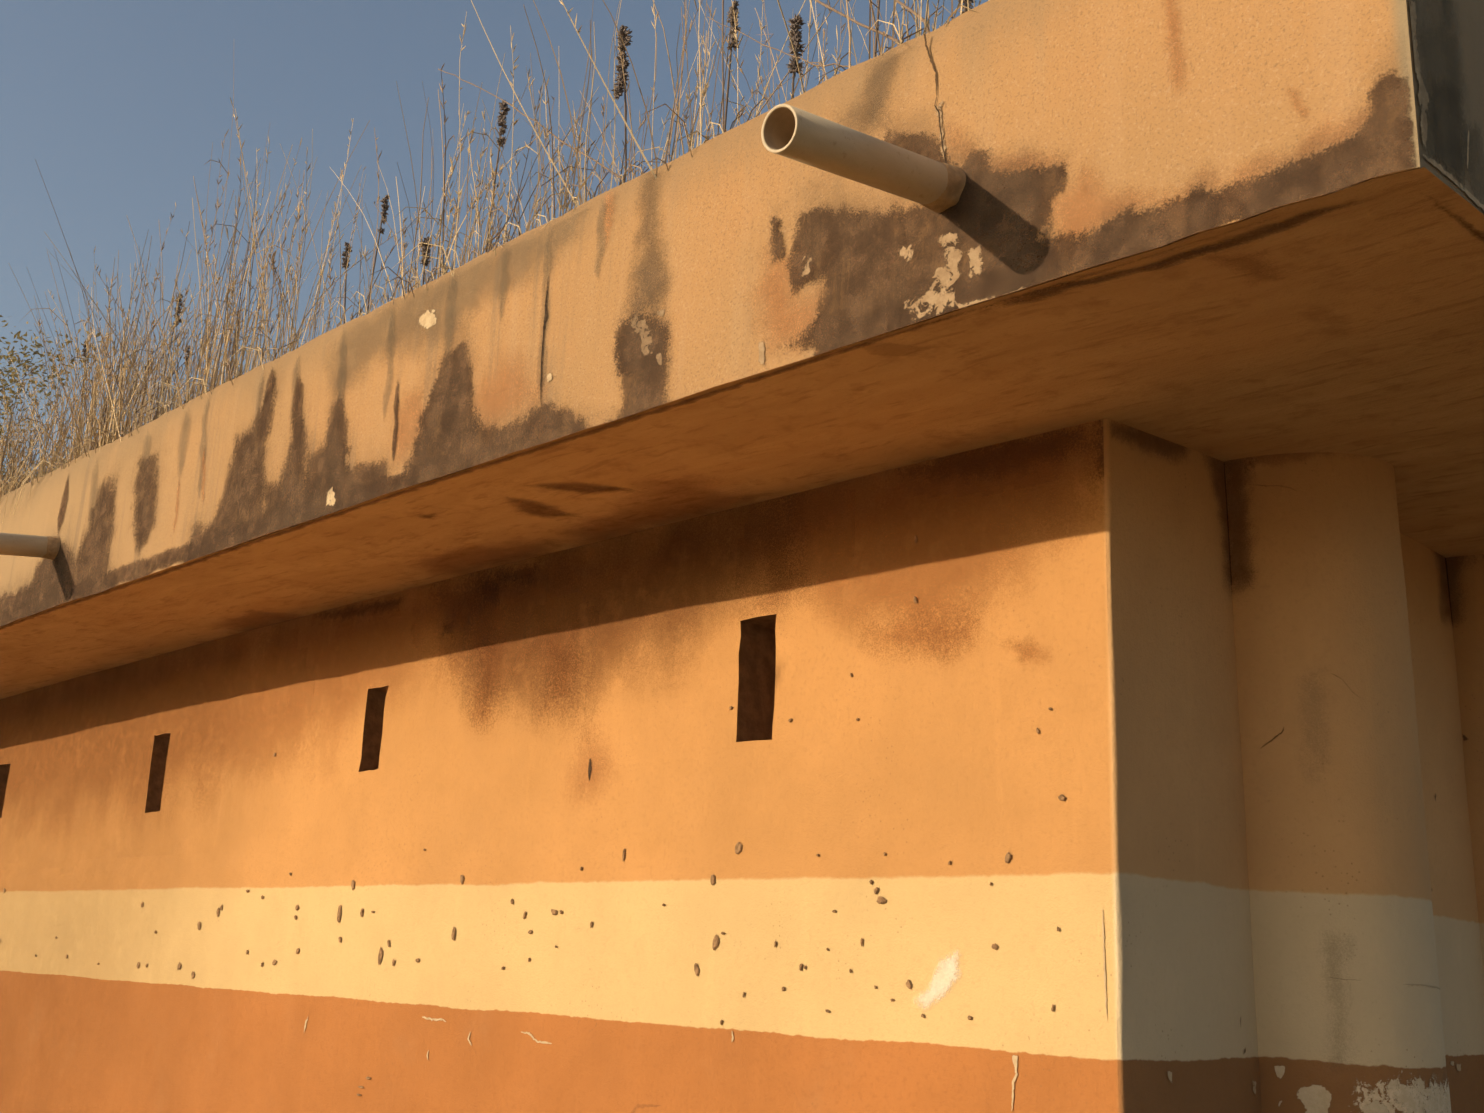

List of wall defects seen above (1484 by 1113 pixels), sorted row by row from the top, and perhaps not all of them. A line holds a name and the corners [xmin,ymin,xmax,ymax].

crack [923,33,947,163]
peeling [898,245,917,262]
peeling [904,232,1026,321]
leakage [0,69,1416,629]
leakage [453,511,794,697]
peeling [1278,1085,1332,1113]
peeling [1351,1061,1461,1113]